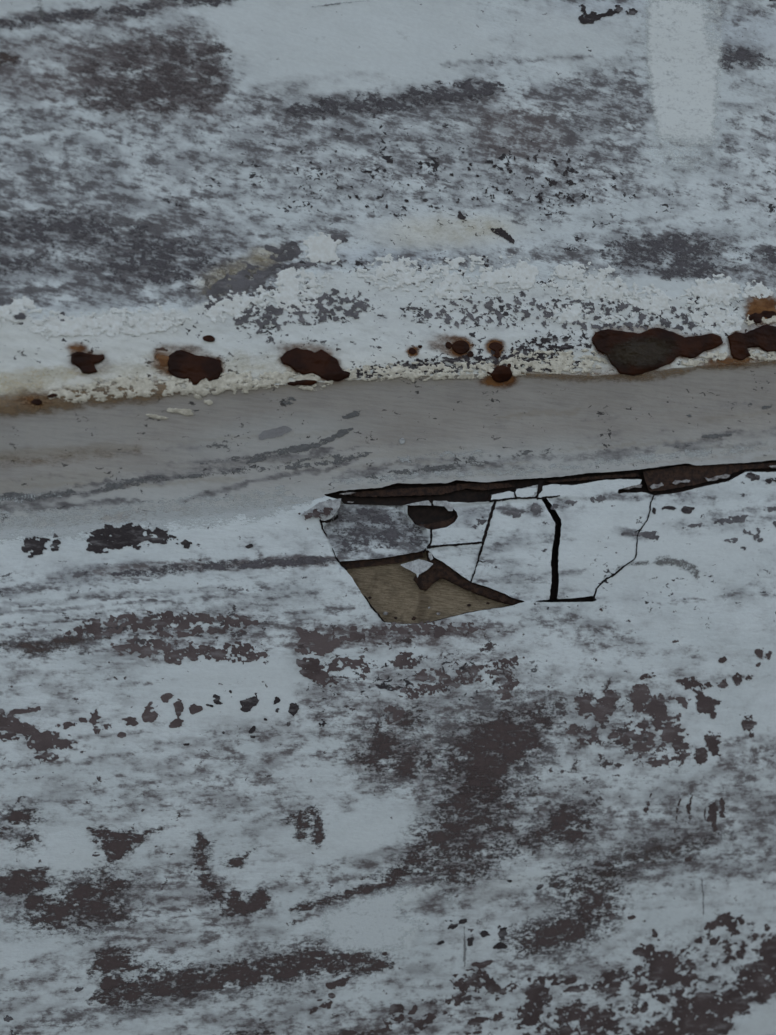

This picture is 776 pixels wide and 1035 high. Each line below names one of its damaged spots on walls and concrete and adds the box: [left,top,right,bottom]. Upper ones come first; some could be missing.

damp [0,381,171,416]
corrosion [68,344,105,374]
corrosion [153,335,224,385]
corrosion [280,344,350,386]
damp [521,360,776,381]
corrosion [592,294,776,376]
spalling [111,460,776,691]
crack [423,480,655,602]
peeling [0,610,268,665]
peeling [0,690,259,764]
peeling [290,648,776,1035]
peeling [0,826,394,1014]